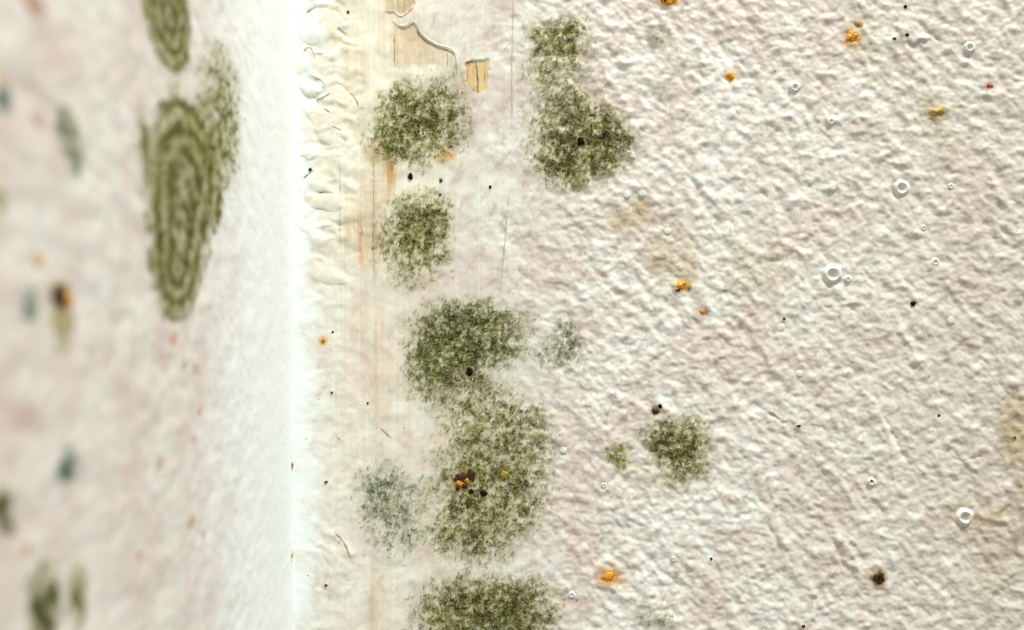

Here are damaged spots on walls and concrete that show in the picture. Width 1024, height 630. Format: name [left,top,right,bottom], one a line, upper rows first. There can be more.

damp [140,0,246,322]
peeling [388,0,457,65]
peeling [466,59,488,92]
damp [521,15,639,194]
damp [351,65,583,630]
damp [605,414,716,491]